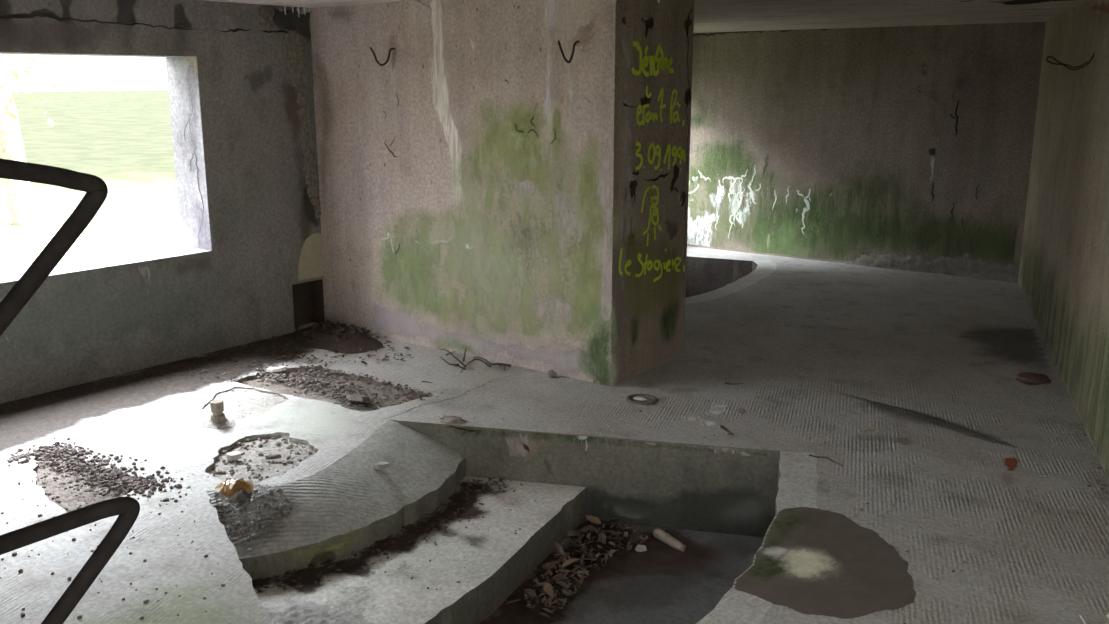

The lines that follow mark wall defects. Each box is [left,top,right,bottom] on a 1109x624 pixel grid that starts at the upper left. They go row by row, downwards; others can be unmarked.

water stain [117,0,136,23]
crack [0,9,291,35]
water stain [175,4,191,29]
water stain [431,0,462,207]
crack [950,100,959,135]
water stain [687,168,761,246]
water stain [773,187,811,233]